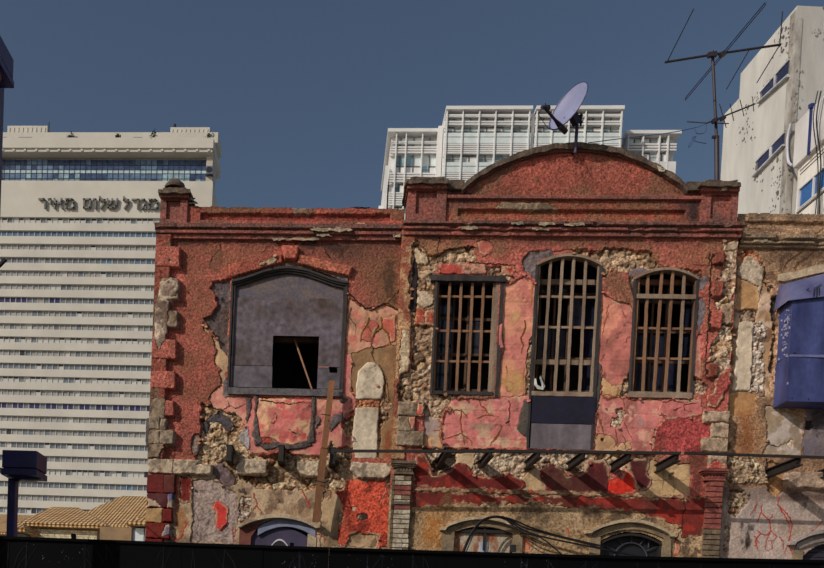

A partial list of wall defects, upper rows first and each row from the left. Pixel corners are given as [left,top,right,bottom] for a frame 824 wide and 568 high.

crack [425,236,515,266]
spalling [147,239,813,556]
crack [433,283,533,446]
crack [750,497,823,553]